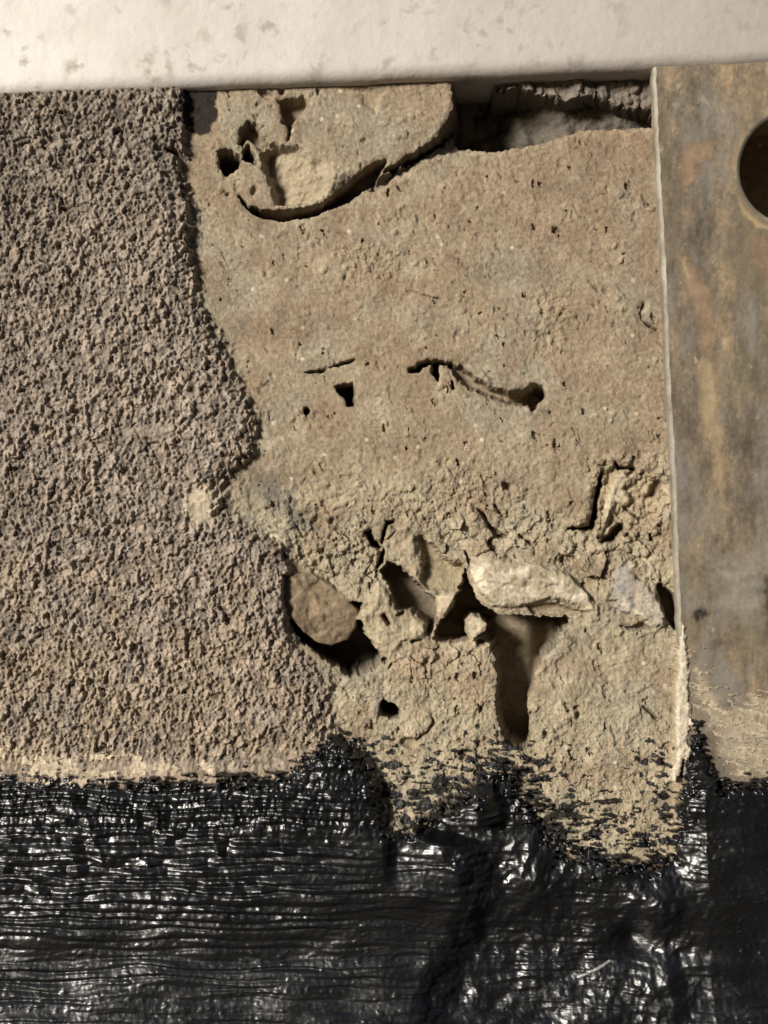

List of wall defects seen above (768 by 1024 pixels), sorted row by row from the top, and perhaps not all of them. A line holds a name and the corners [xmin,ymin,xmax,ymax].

spalling [260,141,354,212]
crack [238,159,388,222]
spalling [368,84,652,192]
corrosion [681,140,716,192]
corrosion [740,202,768,229]
crack [409,359,547,412]
corrosion [679,255,729,511]
spalling [567,461,668,546]
spalling [290,602,389,678]
spalling [380,535,594,749]
spalling [656,583,676,631]